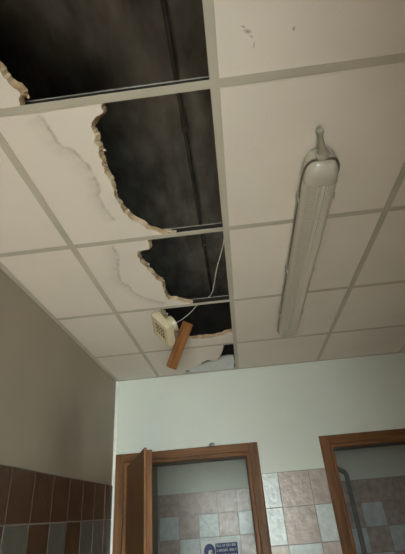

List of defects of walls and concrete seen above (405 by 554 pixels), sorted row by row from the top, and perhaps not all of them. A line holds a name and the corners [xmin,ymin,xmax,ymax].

spalling [0,61,30,106]
spalling [91,103,177,234]
spalling [137,240,193,304]
spalling [188,328,232,339]